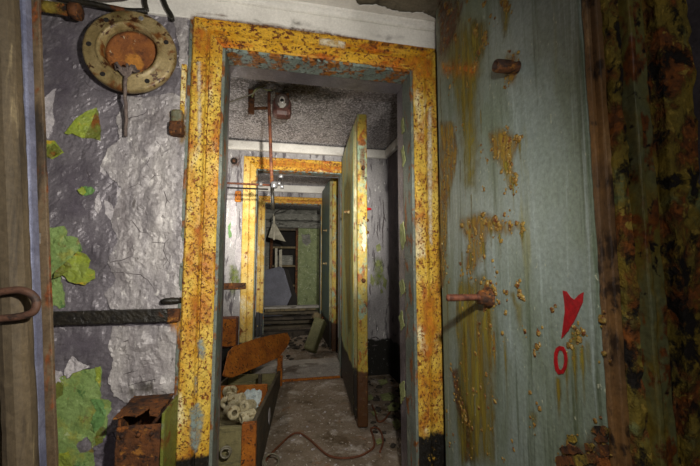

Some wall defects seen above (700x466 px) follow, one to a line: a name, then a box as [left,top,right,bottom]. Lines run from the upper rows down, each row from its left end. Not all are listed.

corrosion [222,15,424,50]
corrosion [259,159,341,171]
corrosion [440,0,524,286]
peeling [50,226,95,309]
peeling [55,325,177,466]
corrosion [445,209,526,462]
corrosion [556,321,588,409]
corrosion [555,416,612,466]